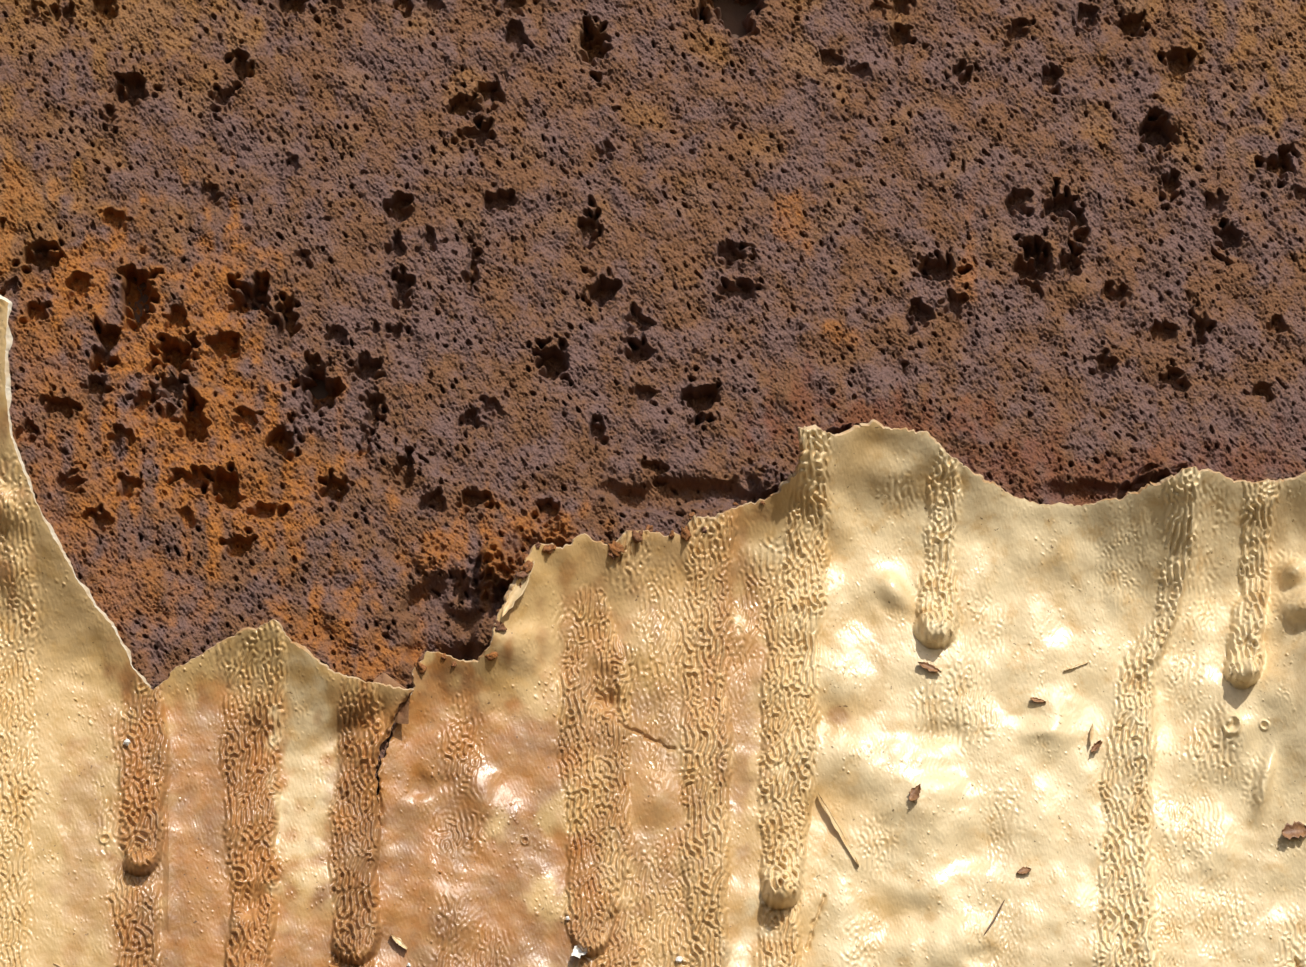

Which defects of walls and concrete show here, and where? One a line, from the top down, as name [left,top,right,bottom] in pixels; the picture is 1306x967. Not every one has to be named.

spalling [97,73,163,135]
rust [0,0,282,96]
spalling [579,16,612,82]
rust [771,190,818,254]
rust [950,195,988,303]
spalling [1005,179,1091,306]
spalling [1137,96,1183,211]
rust [1180,0,1306,179]
spalling [1254,144,1306,203]
rust [0,82,689,967]
peeling [0,237,1306,967]
rust [726,351,1302,885]